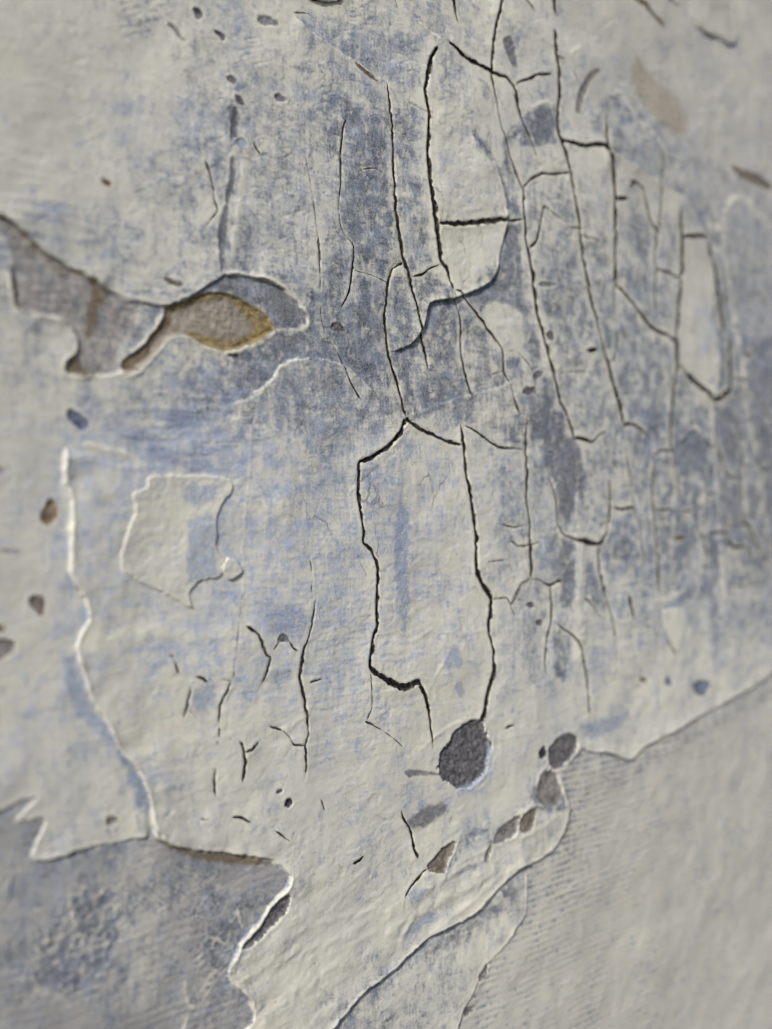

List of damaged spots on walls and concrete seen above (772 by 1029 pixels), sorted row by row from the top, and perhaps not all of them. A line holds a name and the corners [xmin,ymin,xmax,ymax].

peeling [0,221,139,375]
crack [305,0,772,747]
crack [168,550,321,823]
peeling [0,799,288,1029]
peeling [458,674,772,1029]